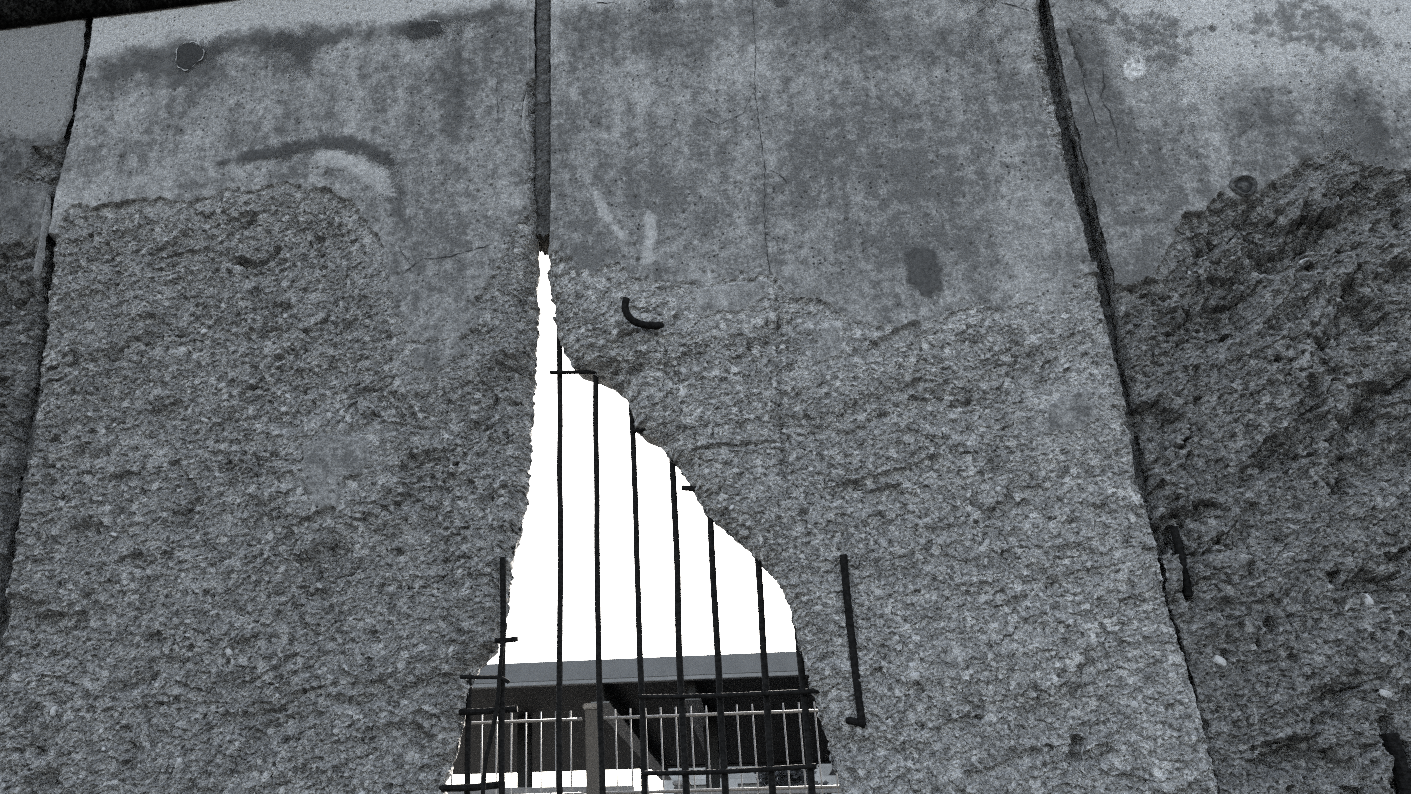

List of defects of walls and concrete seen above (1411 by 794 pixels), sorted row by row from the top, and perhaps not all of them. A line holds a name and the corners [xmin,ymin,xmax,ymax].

spalling [0,77,540,794]
leakage [905,246,943,297]
spalling [547,0,1411,794]